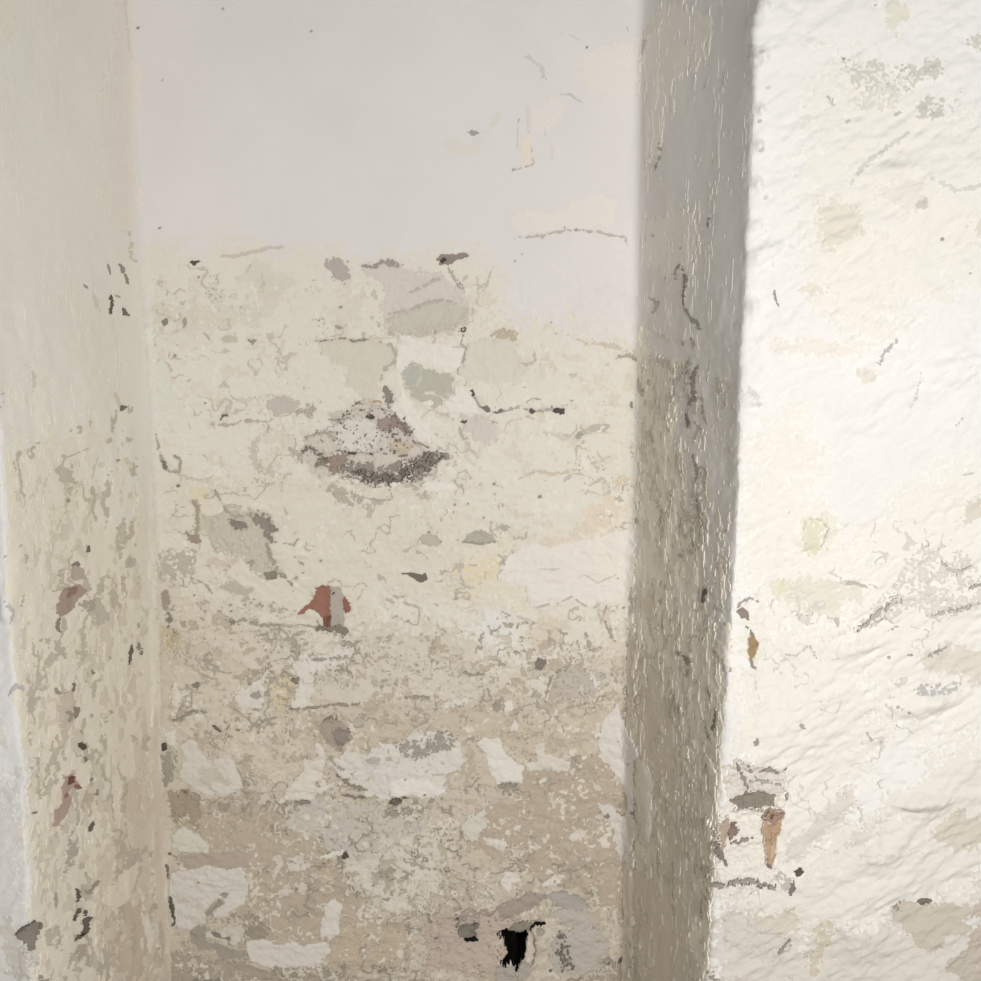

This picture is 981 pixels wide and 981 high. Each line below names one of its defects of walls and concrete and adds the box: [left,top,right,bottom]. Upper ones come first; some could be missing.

spalling [324,256,351,285]
spalling [364,252,473,339]
peeling [401,360,455,409]
spalling [296,385,454,507]
spalling [185,507,284,580]
spalling [56,565,96,617]
flaking render [298,585,351,638]
peeling [401,572,428,582]
water stain [0,220,981,981]
spalling [52,774,94,827]
peeling [80,633,792,981]
corrosion [761,807,786,870]